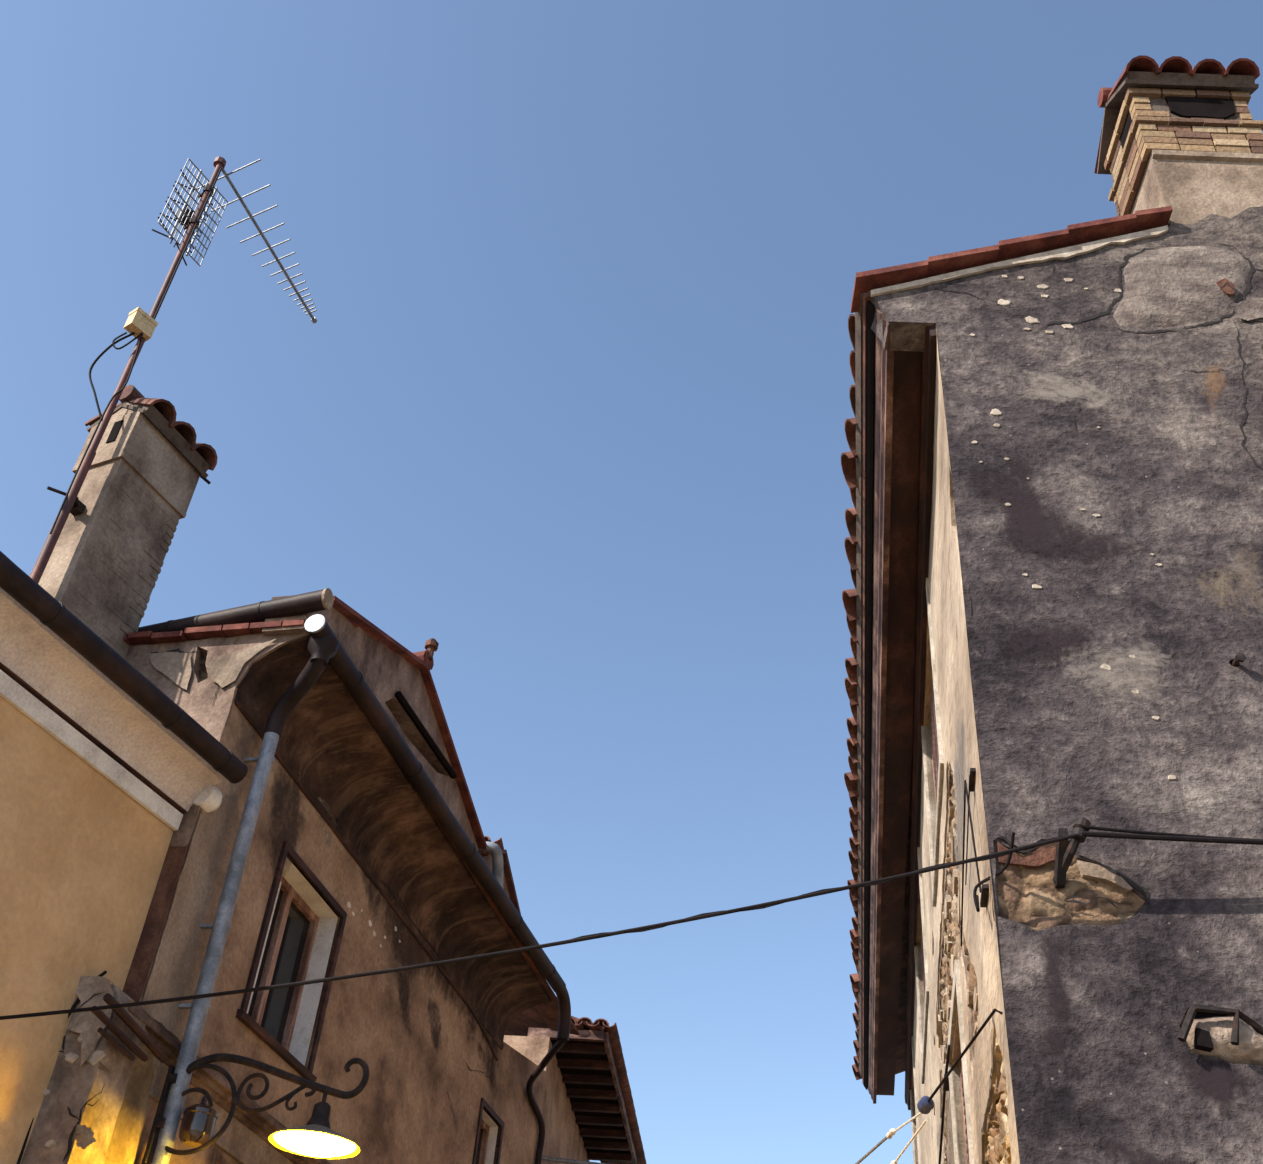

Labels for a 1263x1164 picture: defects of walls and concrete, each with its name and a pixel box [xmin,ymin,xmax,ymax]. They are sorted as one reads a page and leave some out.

water stain [1031,373,1107,407]
crack [1033,243,1263,470]
water stain [977,463,1122,559]
crack [151,646,199,654]
spalling [990,835,1151,932]
spalling [939,766,1012,1164]
peeling [65,1033,106,1066]
spalling [74,1124,96,1149]